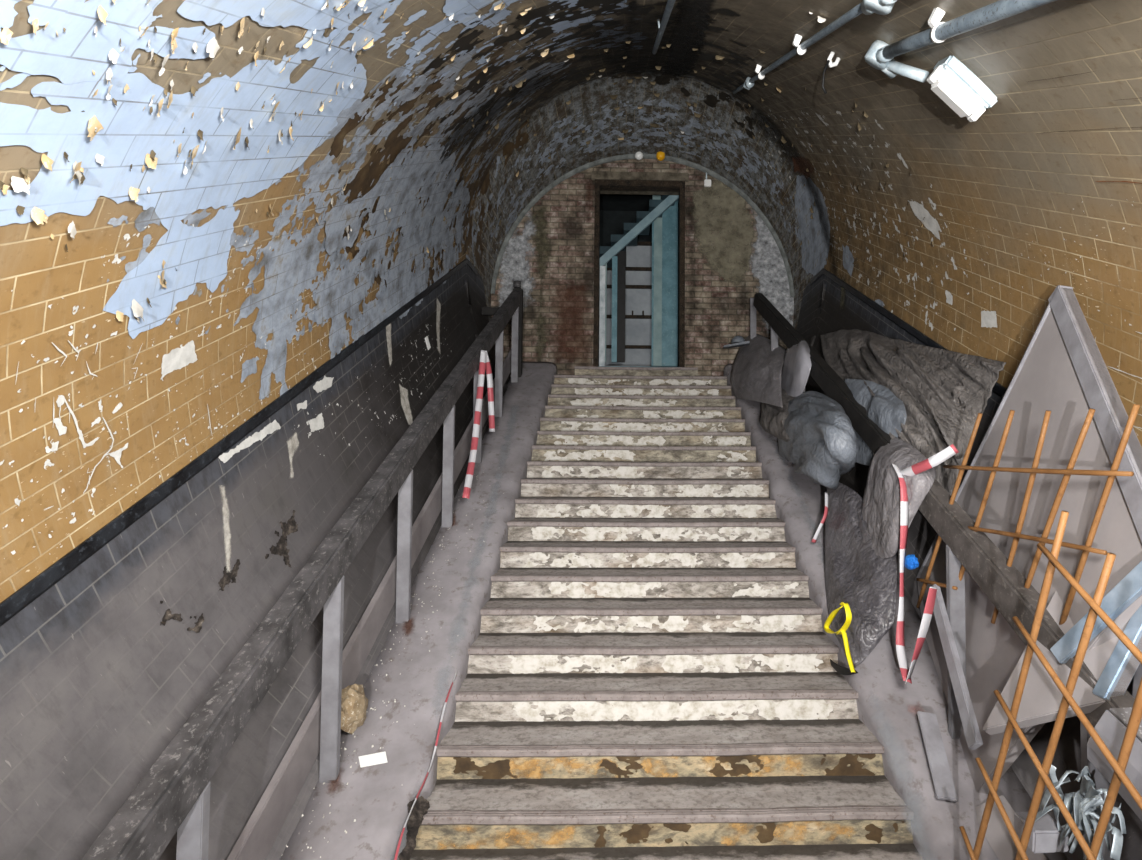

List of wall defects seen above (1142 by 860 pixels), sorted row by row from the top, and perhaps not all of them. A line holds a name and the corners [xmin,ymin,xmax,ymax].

peeling [0,0,988,473]
leakage [499,207,551,362]
leakage [749,215,794,326]
peeling [981,310,997,328]
crack [52,340,98,376]
crack [15,363,114,494]
leakage [221,487,231,571]
spalling [265,510,298,567]
spalling [218,559,240,591]
corrosion [509,757,617,778]
corrosion [747,755,803,777]
corrosion [439,827,574,850]